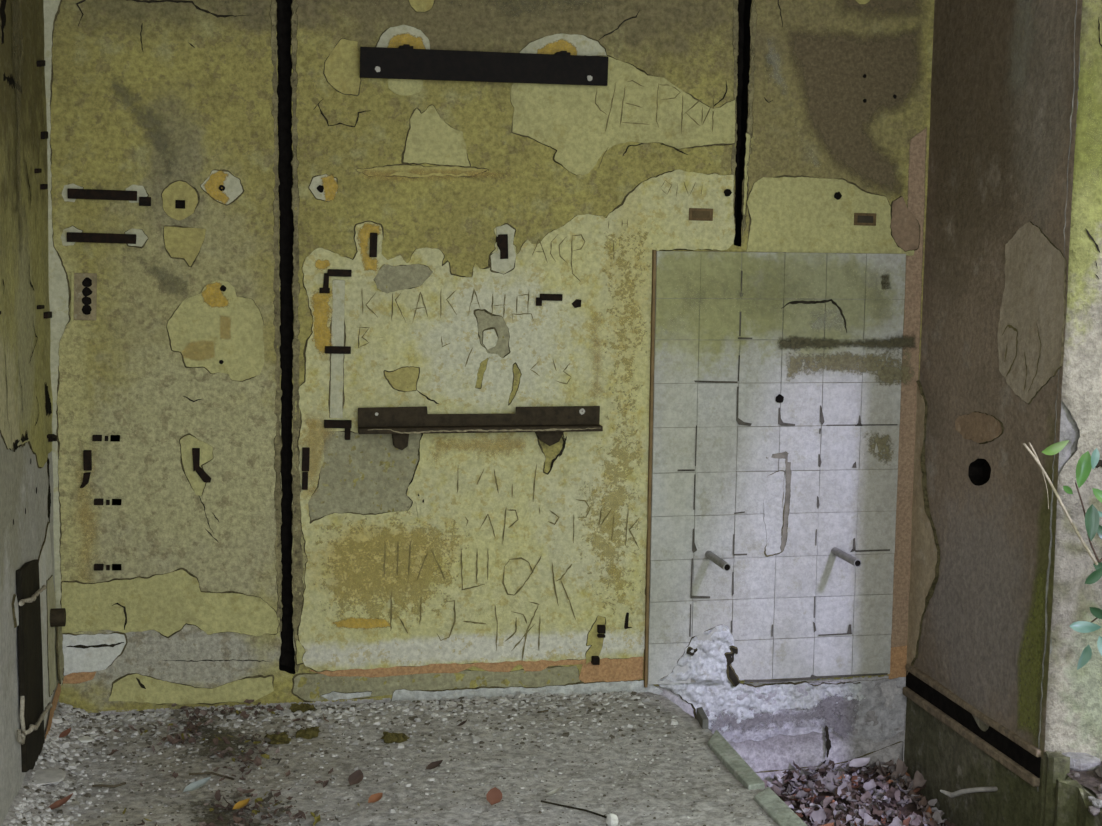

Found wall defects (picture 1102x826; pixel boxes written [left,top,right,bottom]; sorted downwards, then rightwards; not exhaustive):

leakage [842,0,921,15]
leakage [791,31,921,192]
crack [1085,228,1100,279]
peeling [0,0,920,731]
spalling [656,380,1043,826]